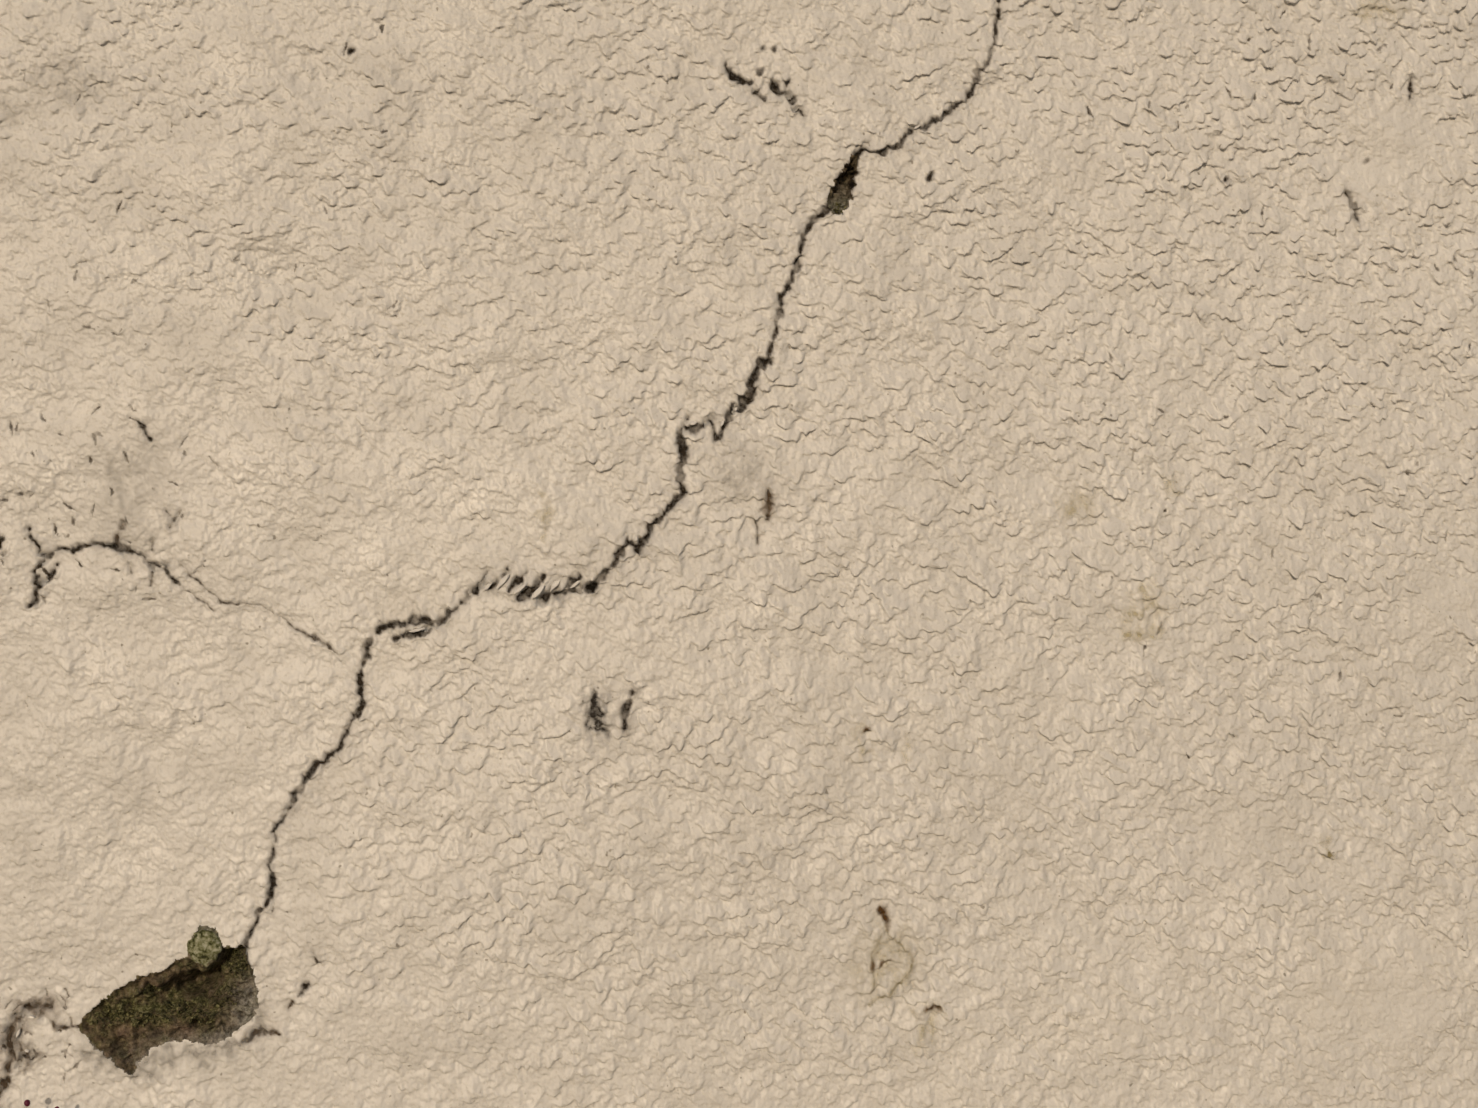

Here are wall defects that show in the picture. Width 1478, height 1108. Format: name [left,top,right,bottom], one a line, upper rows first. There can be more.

crack [244,0,1001,948]
crack [0,521,240,610]
crack [0,998,53,1095]
spalling [52,925,259,1077]